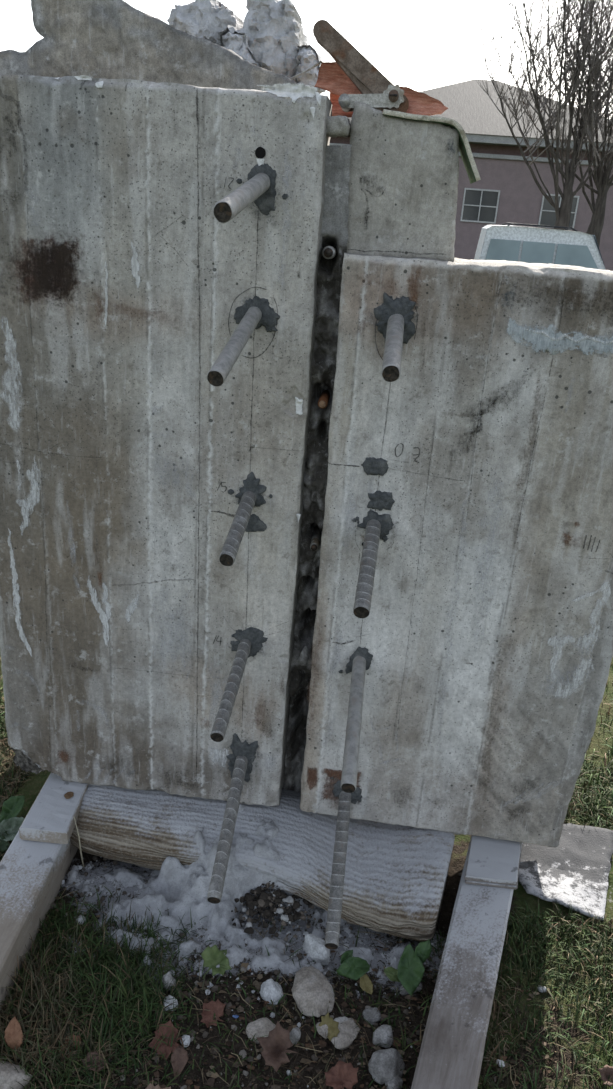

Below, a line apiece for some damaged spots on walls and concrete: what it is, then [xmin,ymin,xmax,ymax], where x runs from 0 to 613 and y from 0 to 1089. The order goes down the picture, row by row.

peeling [507,318,613,355]
water stain [2,320,21,429]
water stain [8,460,40,657]
water stain [88,573,111,645]
rust [307,769,342,800]